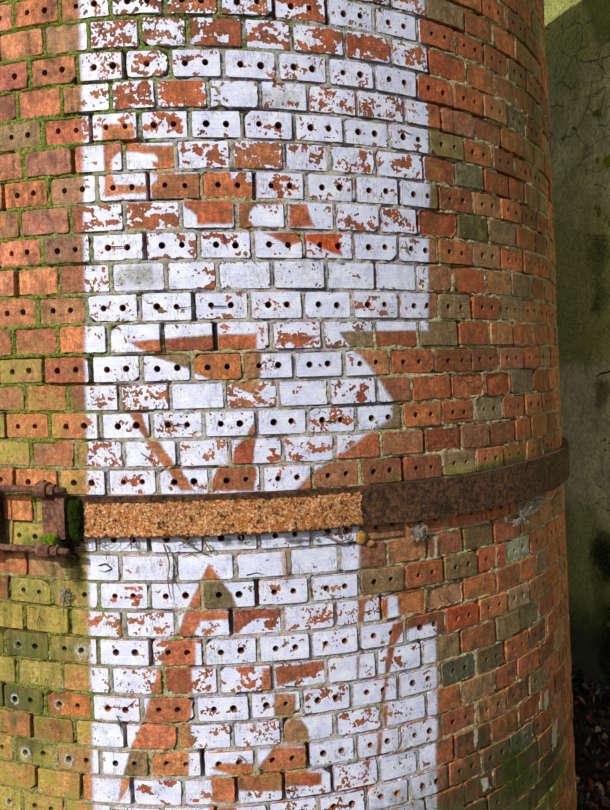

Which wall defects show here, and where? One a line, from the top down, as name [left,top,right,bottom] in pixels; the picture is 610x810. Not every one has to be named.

peeling [81,0,427,198]
peeling [83,203,302,259]
spalling [338,208,456,261]
spalling [84,266,138,322]
peeling [90,385,198,436]
peeling [227,381,276,408]
peeling [311,378,372,431]
peeling [267,439,331,462]
rust [83,491,364,538]
spalling [289,579,463,631]
spalling [88,586,380,746]
spalling [318,761,376,810]